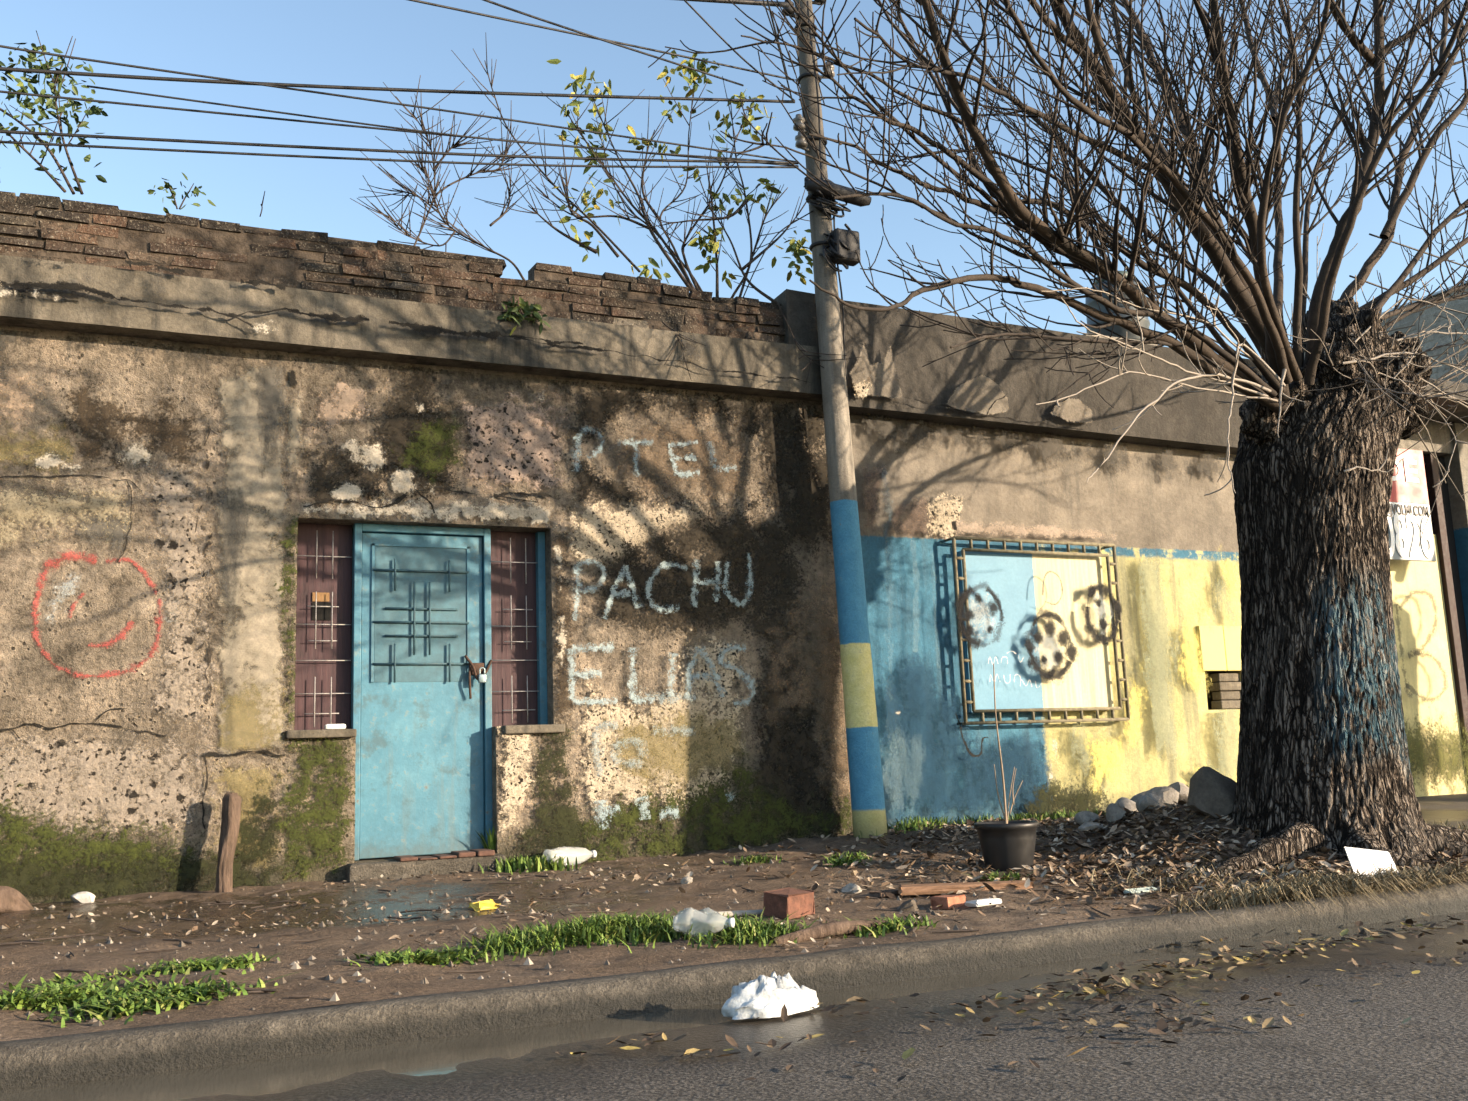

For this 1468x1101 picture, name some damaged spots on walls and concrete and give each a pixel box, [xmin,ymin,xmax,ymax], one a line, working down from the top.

damp [0,329,35,351]
crack [0,260,811,383]
flaking render [307,382,386,472]
damp [255,355,526,516]
flaking render [330,483,362,501]
flaking render [863,467,935,537]
flaking render [956,520,1116,540]
damp [544,380,852,837]
crack [0,708,166,744]
damp [0,773,295,903]